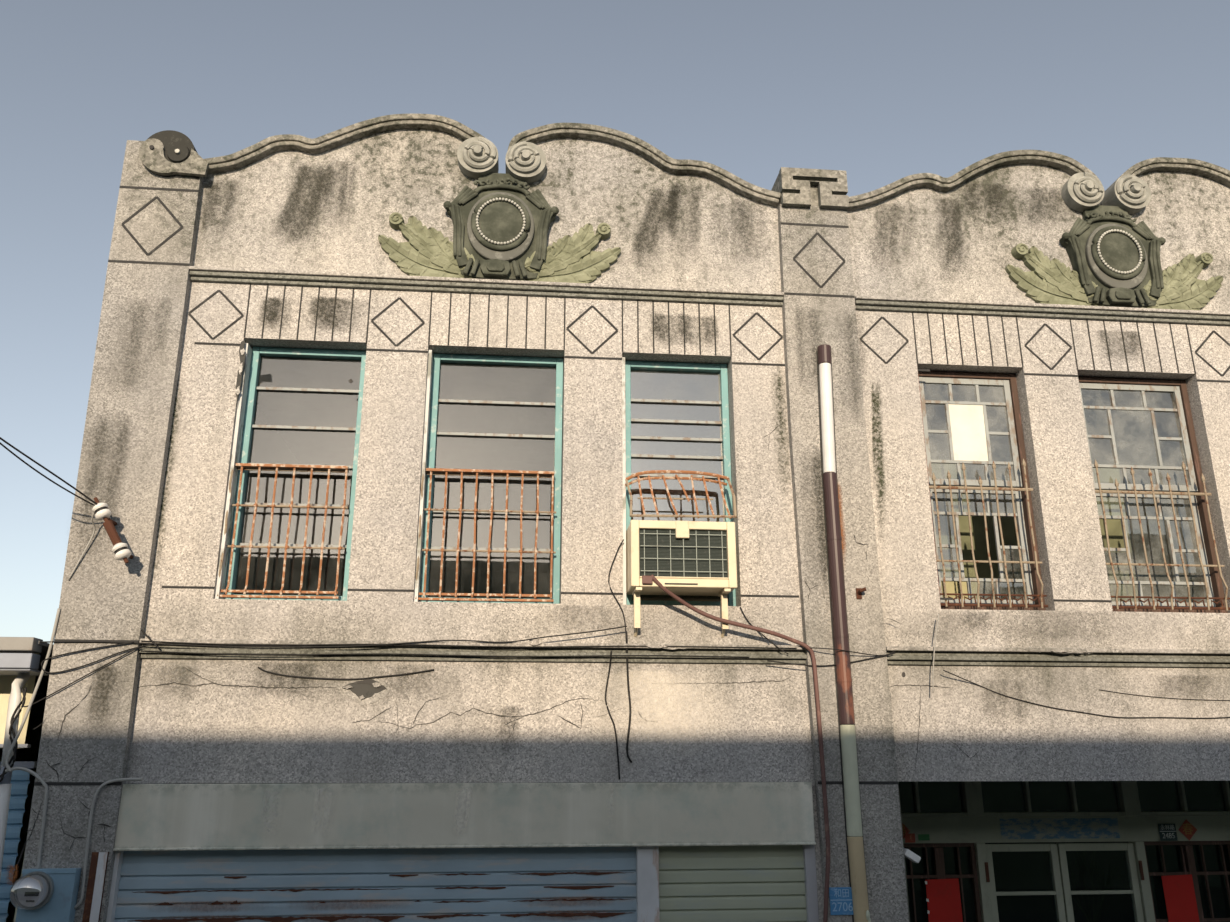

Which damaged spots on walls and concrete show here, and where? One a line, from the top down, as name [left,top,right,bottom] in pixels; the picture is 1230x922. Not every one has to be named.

crack [353,677,794,732]
corrosion [131,872,634,922]